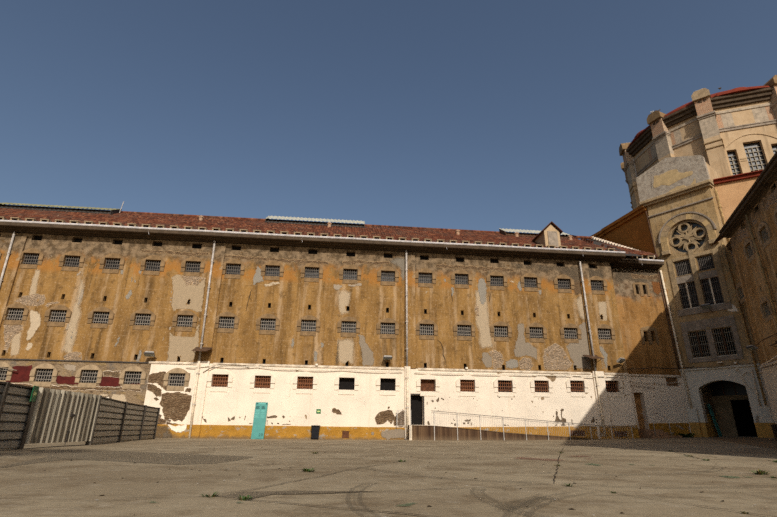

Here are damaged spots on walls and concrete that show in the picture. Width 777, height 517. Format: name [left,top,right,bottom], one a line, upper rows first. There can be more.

flaking render [3,293,60,353]
flaking render [163,274,206,362]
peeling [6,365,33,387]
flaking render [43,351,192,433]
flaking render [518,343,573,382]
flaking render [371,407,405,440]